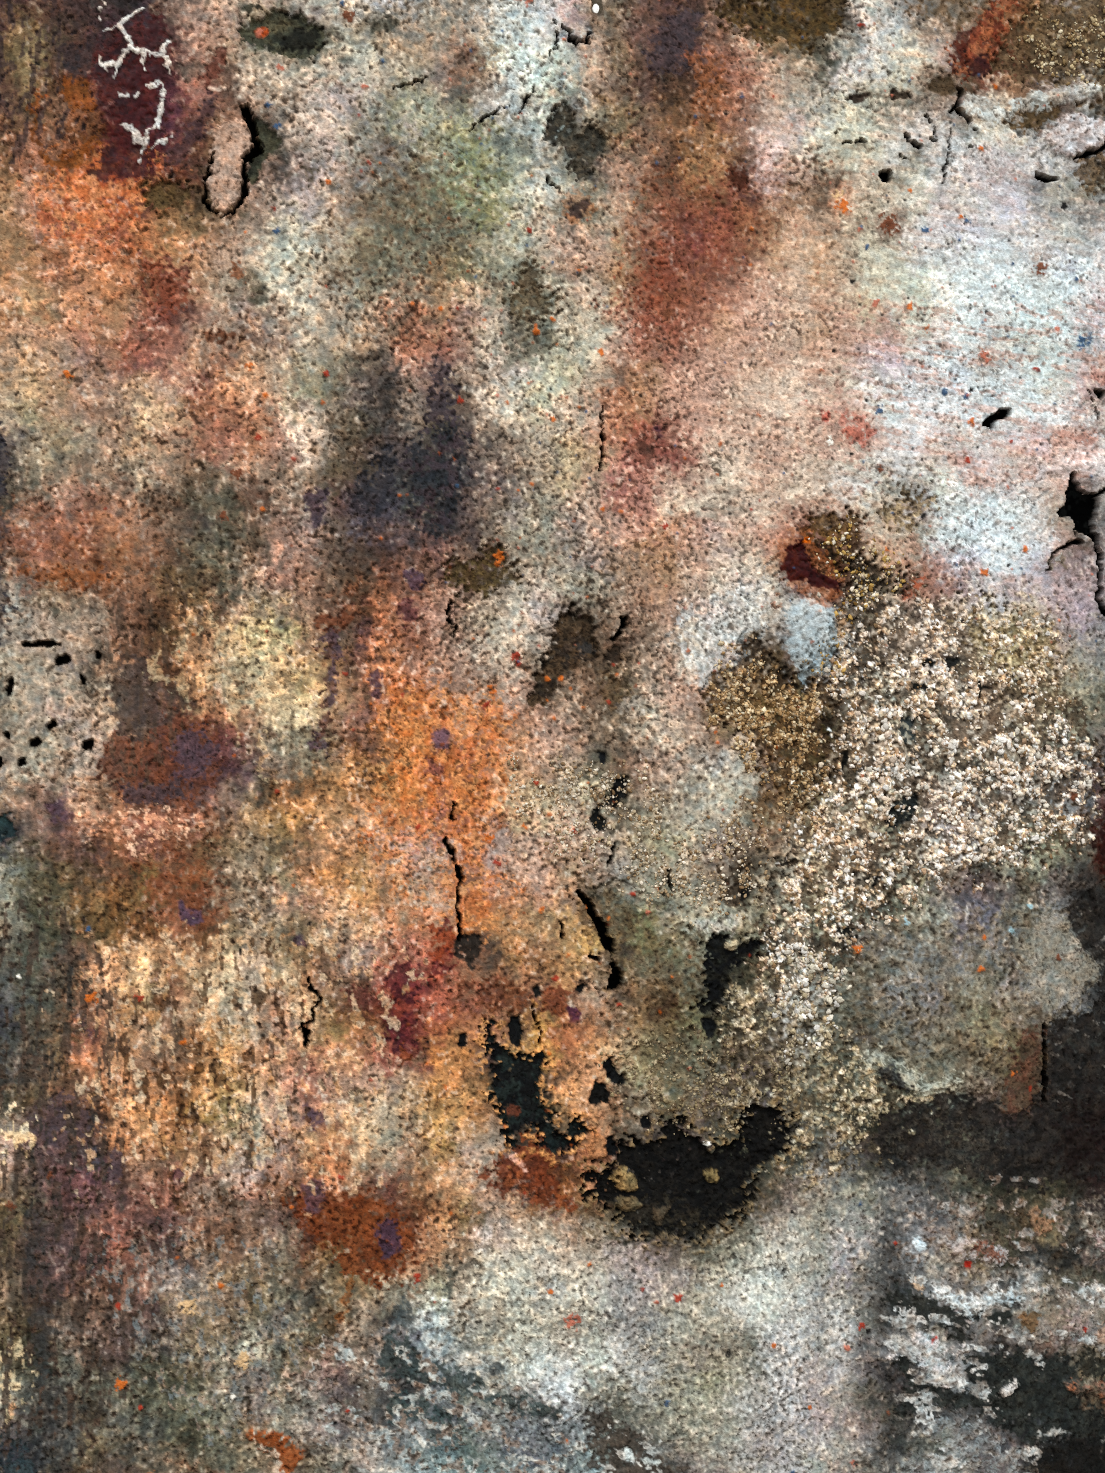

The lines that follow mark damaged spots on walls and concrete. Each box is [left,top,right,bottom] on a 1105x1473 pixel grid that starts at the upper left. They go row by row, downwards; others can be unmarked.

crack [65,0,185,191]
flaking render [136,115,283,221]
crack [201,102,265,218]
flaking render [300,161,321,192]
corrosion [558,43,802,363]
crack [1045,471,1105,618]
damp [659,548,787,712]
corrosion [306,606,597,1069]
damp [586,854,748,940]
damp [646,741,771,835]
flaking render [505,480,1105,1192]
corrosion [279,1174,421,1328]